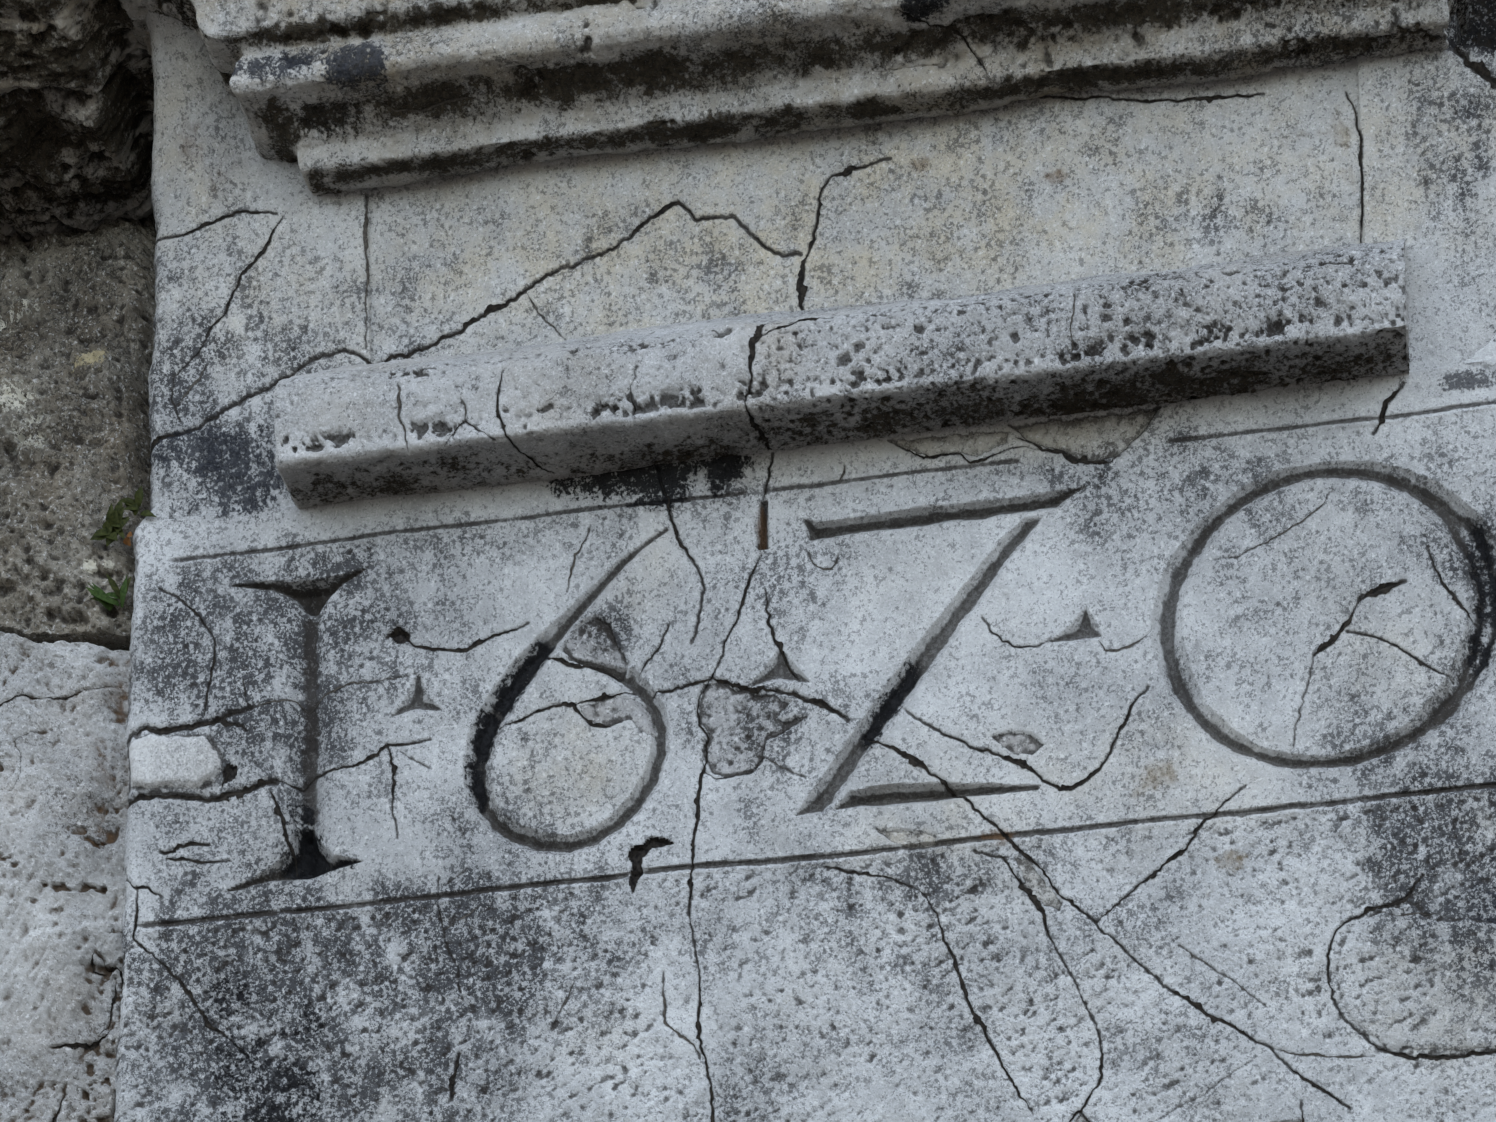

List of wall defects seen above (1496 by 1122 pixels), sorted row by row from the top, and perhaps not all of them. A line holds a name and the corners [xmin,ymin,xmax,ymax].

damp [231,39,388,137]
damp [900,0,950,24]
crack [1457,51,1496,89]
crack [1346,93,1364,242]
crack [150,159,884,500]
crack [1373,389,1400,434]
peeling [1464,334,1496,366]
crack [129,739,430,875]
crack [128,593,528,742]
spalling [699,683,800,779]
crack [503,476,1496,1122]
crack [53,841,230,1050]